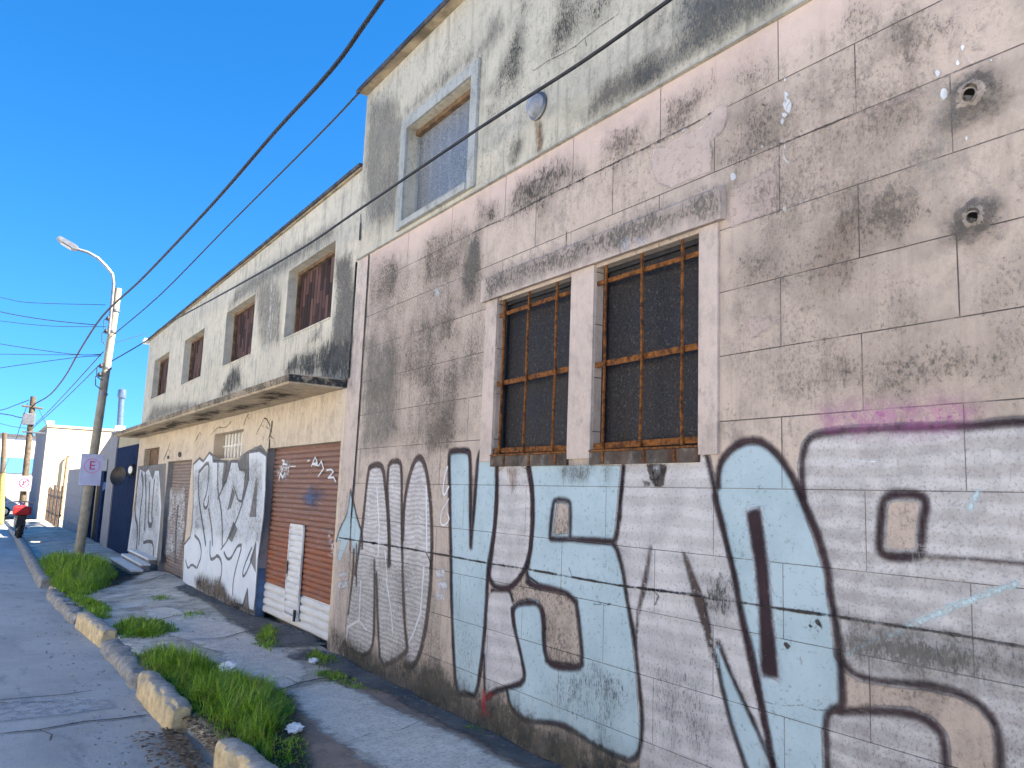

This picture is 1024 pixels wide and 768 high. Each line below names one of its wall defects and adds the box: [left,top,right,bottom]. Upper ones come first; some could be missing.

damp [366,100,401,222]
damp [478,159,581,221]
damp [550,0,612,58]
damp [588,0,785,119]
damp [661,72,716,135]
damp [113,254,353,436]
damp [364,192,721,453]